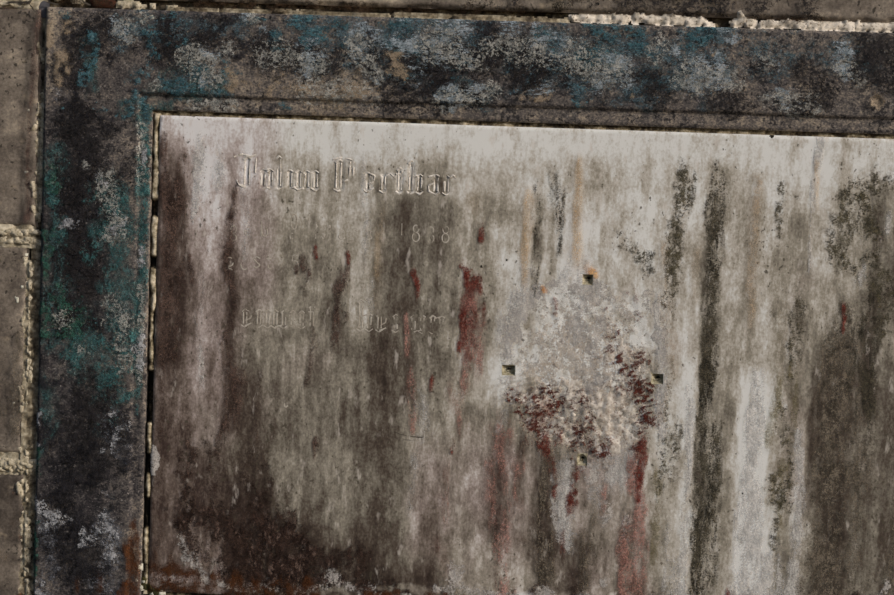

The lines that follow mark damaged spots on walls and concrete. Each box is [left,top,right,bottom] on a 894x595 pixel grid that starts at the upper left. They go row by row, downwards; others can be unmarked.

water stain [0,0,894,437]
water stain [0,362,139,595]
corrosion [117,519,320,595]
water stain [173,183,411,595]
water stain [433,562,517,595]
corrosion [488,384,613,595]
water stain [528,412,639,595]
corrosion [590,311,662,595]
water stain [616,160,726,595]
water stain [729,167,894,595]